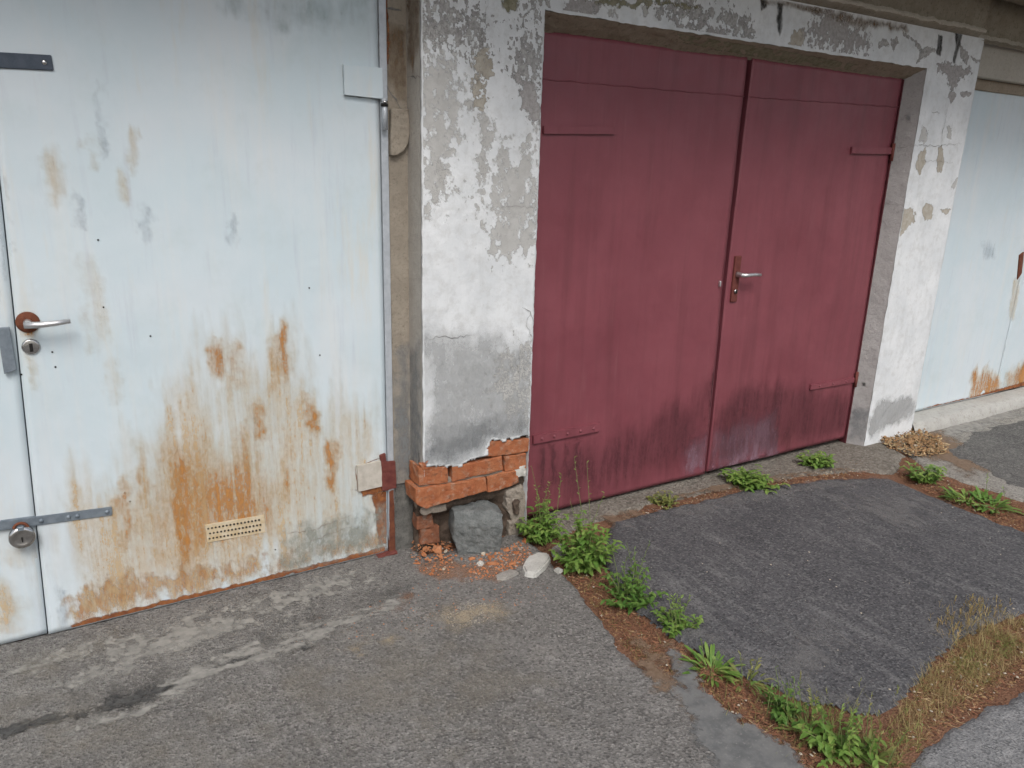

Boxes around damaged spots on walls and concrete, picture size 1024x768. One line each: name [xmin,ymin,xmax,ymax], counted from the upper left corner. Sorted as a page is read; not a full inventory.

peeling [642,0,756,39]
peeling [788,6,980,103]
peeling [422,0,551,269]
peeling [900,203,950,236]
corrosion [207,346,224,375]
corrosion [271,325,288,383]
corrosion [286,398,320,454]
leakage [394,337,530,472]
spalling [405,339,532,552]
leakage [853,397,913,436]
corrosion [924,365,1024,409]
corrosion [70,417,396,627]